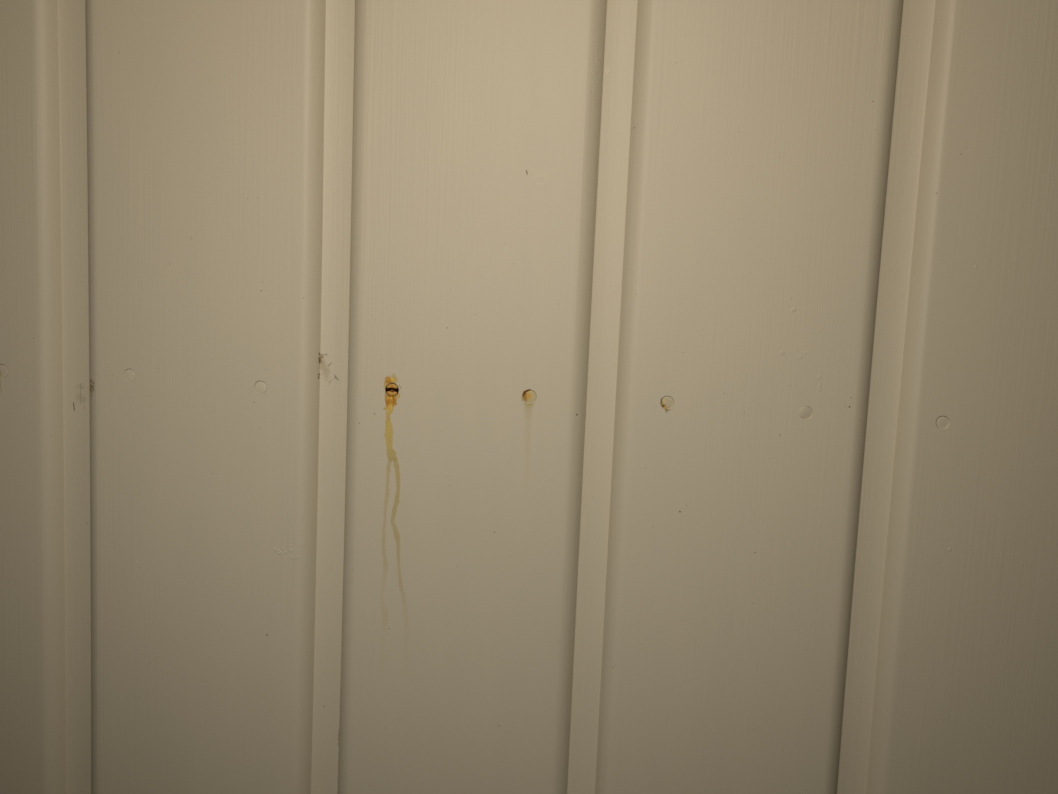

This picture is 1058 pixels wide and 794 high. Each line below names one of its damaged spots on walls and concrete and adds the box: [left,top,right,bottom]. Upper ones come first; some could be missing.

corrosion [384,375,400,486]
corrosion [522,389,535,402]